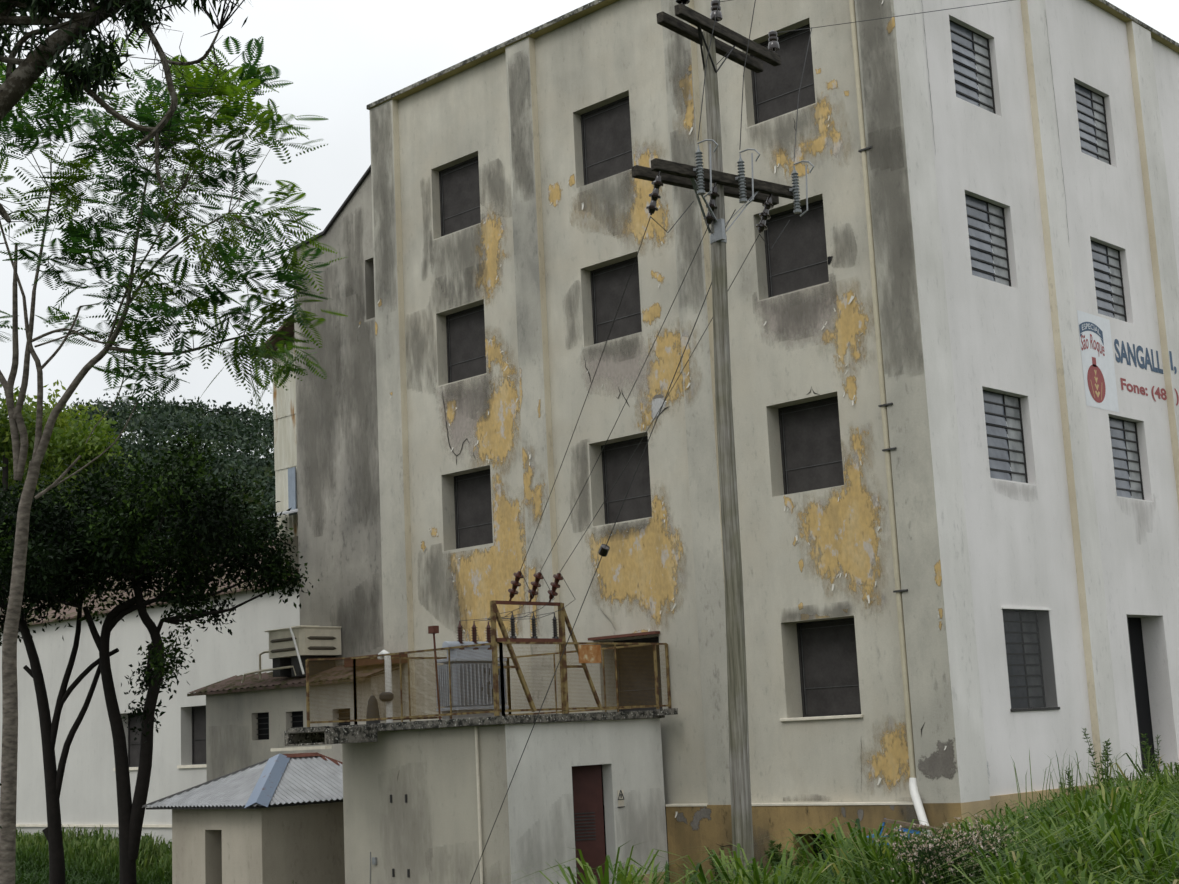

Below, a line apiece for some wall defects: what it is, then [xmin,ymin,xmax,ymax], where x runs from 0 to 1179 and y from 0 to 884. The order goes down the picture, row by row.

peeling [476,214,505,299]
damp [509,61,529,190]
peeling [605,145,669,248]
peeling [773,68,849,176]
damp [862,0,916,360]
damp [299,222,375,532]
peeling [587,303,693,430]
peeling [822,286,869,405]
peeling [450,335,545,646]
peeling [589,496,683,637]
peeling [784,428,881,605]
peeling [868,723,956,789]